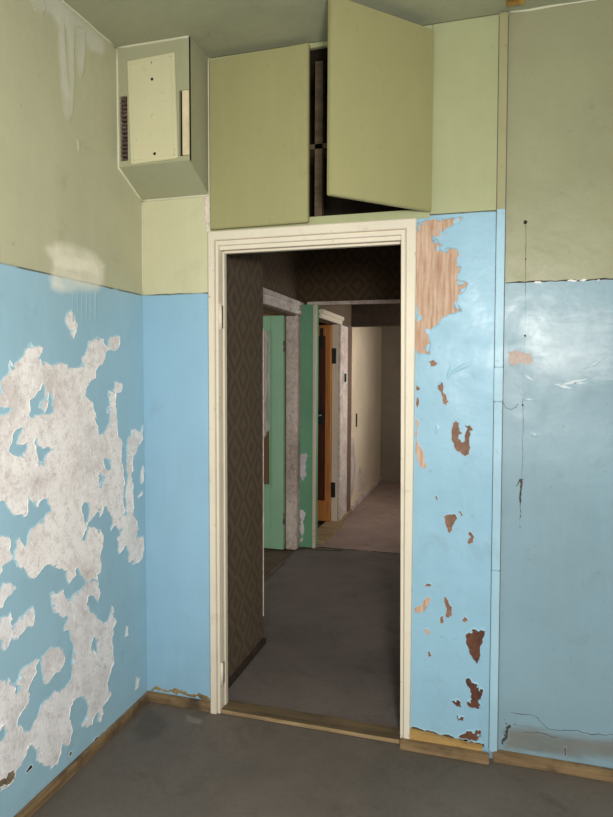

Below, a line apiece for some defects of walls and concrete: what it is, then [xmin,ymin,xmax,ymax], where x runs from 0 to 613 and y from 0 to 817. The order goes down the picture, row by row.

damp [20,0,110,123]
peeling [415,216,469,367]
flaking render [508,350,533,366]
peeling [414,385,428,470]
peeling [437,381,449,406]
peeling [451,420,474,457]
peeling [443,510,463,534]
peeling [0,335,145,792]
peeling [413,582,432,613]
peeling [439,595,486,665]
peeling [410,677,486,748]
crack [511,712,611,738]